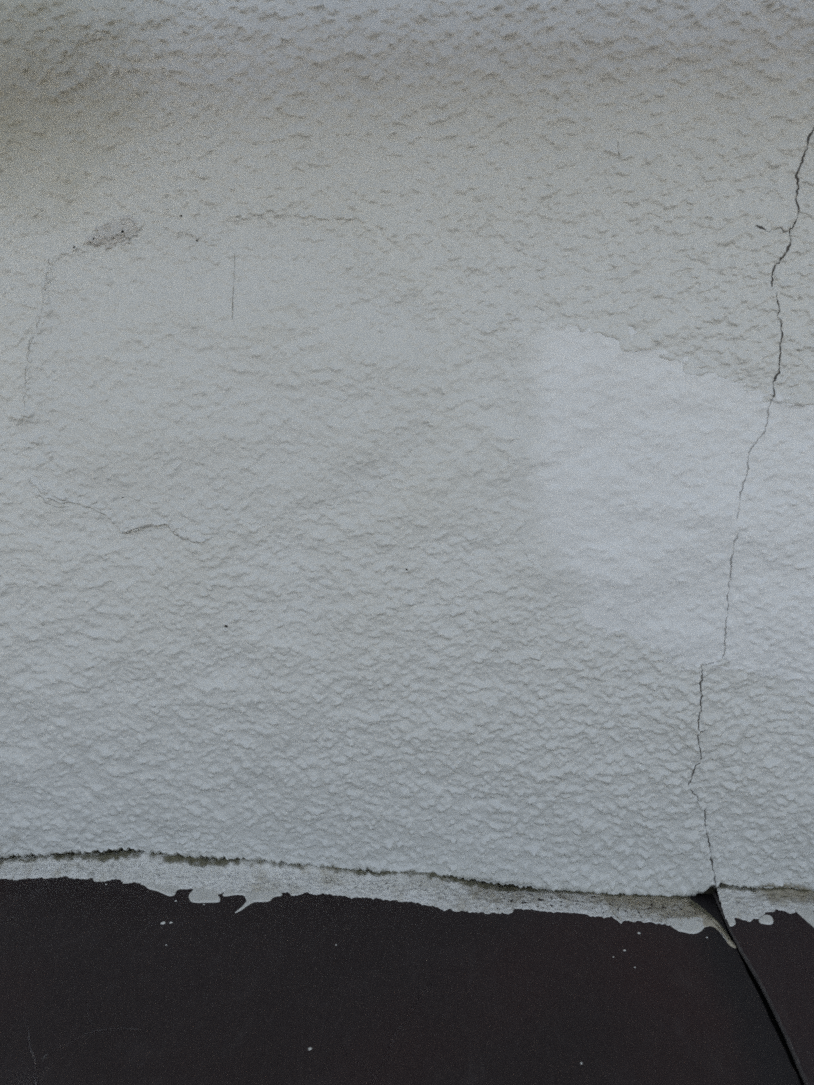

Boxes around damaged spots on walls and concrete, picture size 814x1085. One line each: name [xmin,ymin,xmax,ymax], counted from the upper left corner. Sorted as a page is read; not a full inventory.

crack [689,129,814,888]